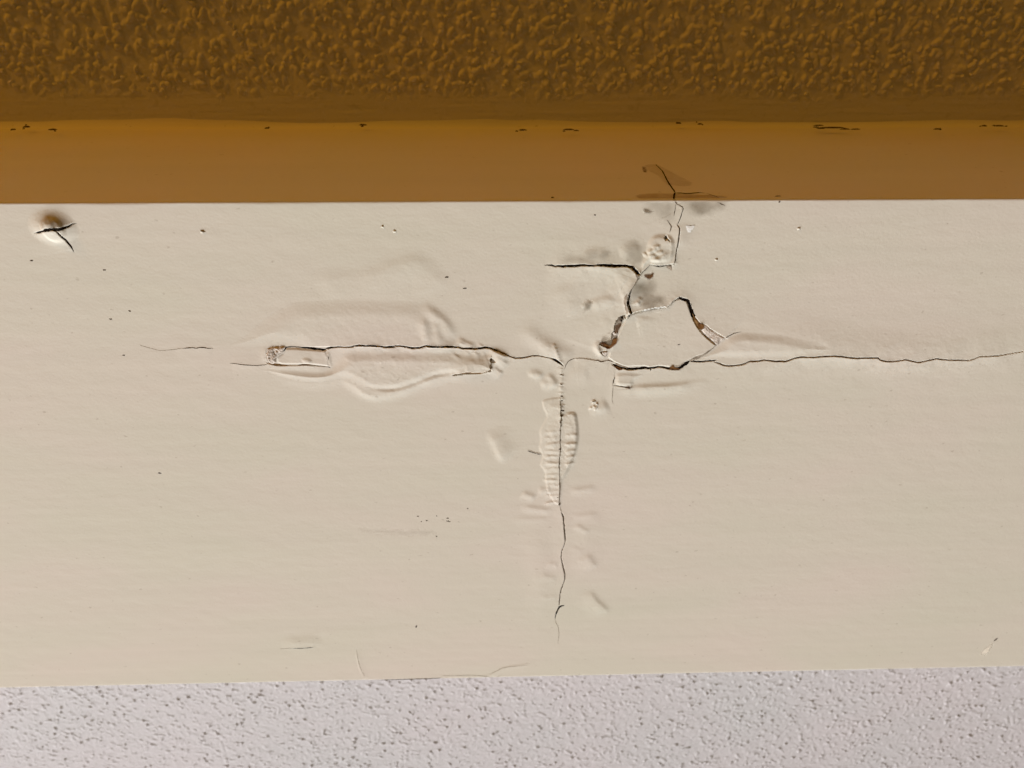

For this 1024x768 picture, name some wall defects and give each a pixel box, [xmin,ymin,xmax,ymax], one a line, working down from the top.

crack [36,223,77,252]
crack [141,336,213,366]
crack [315,165,1024,640]
peeling [609,260,754,367]